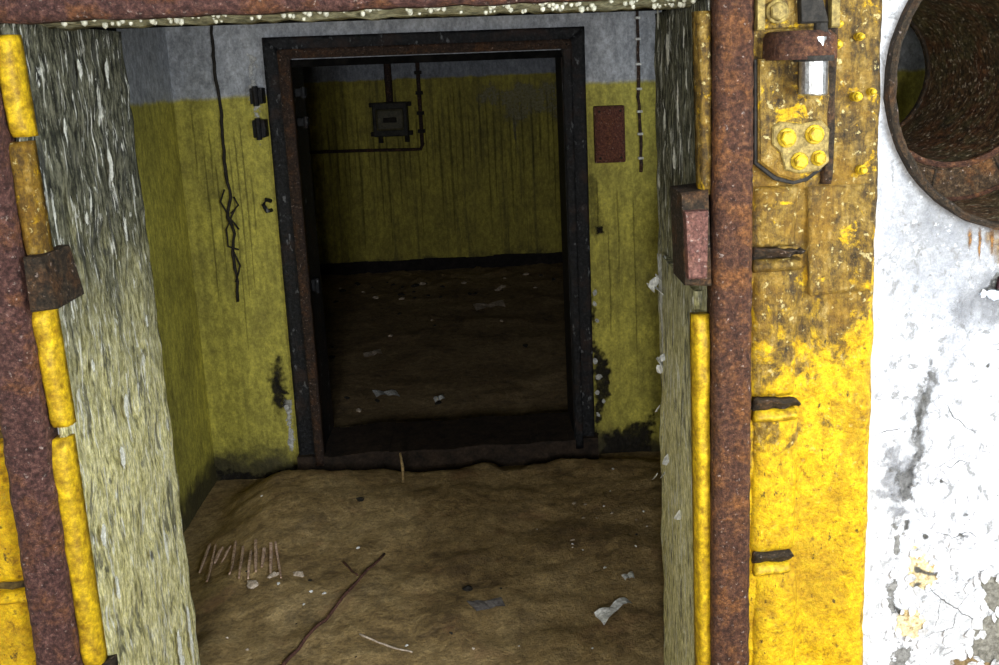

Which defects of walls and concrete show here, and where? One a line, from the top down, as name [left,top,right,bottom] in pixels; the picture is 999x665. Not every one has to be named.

rust [968,230,999,257]
water stain [269,357,290,409]
water stain [601,410,655,454]
water stain [879,360,938,559]